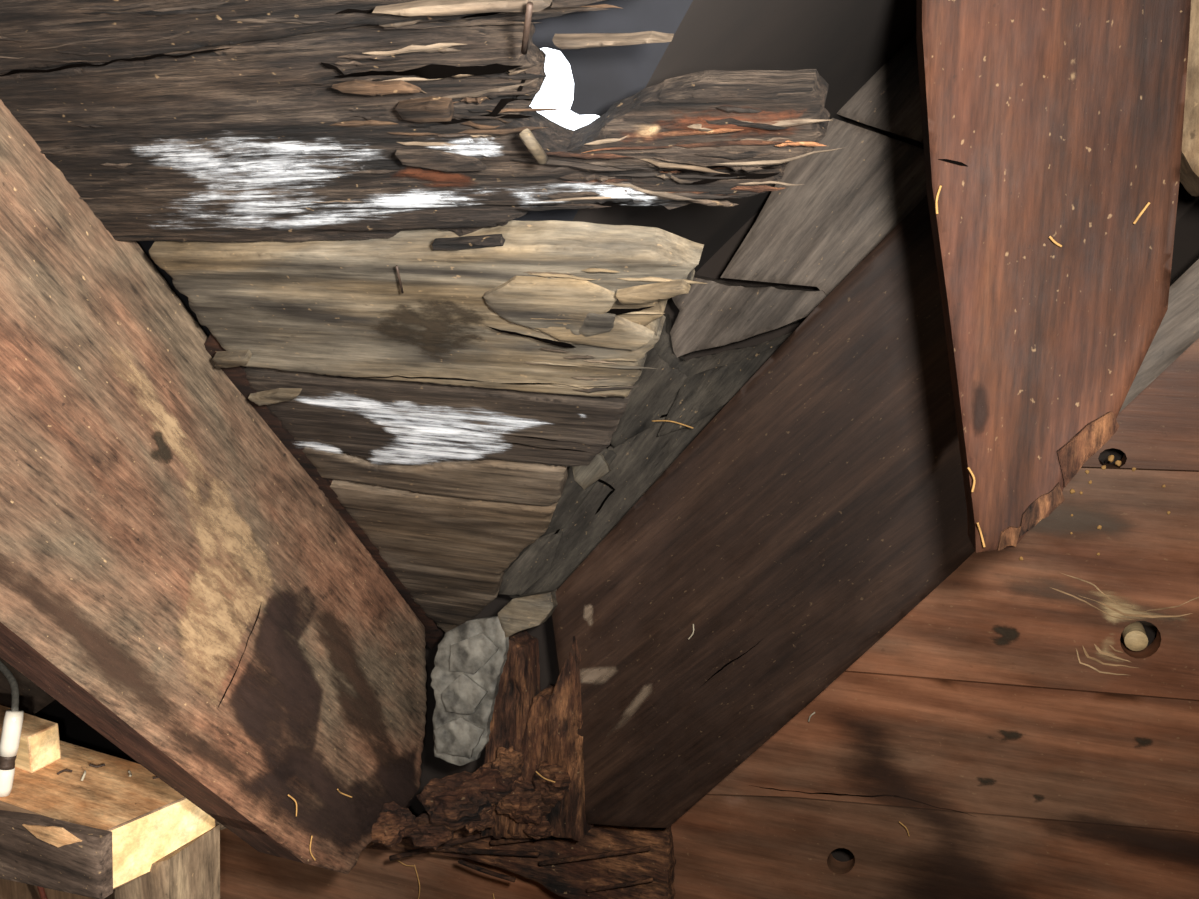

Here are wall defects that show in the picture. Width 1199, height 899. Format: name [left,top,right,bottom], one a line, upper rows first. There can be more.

crack [0,47,234,76]
peeling [395,149,487,172]
damp [449,139,499,157]
damp [137,137,469,228]
damp [560,183,652,205]
peeling [579,313,616,337]
damp [297,396,551,464]
damp [0,557,417,847]